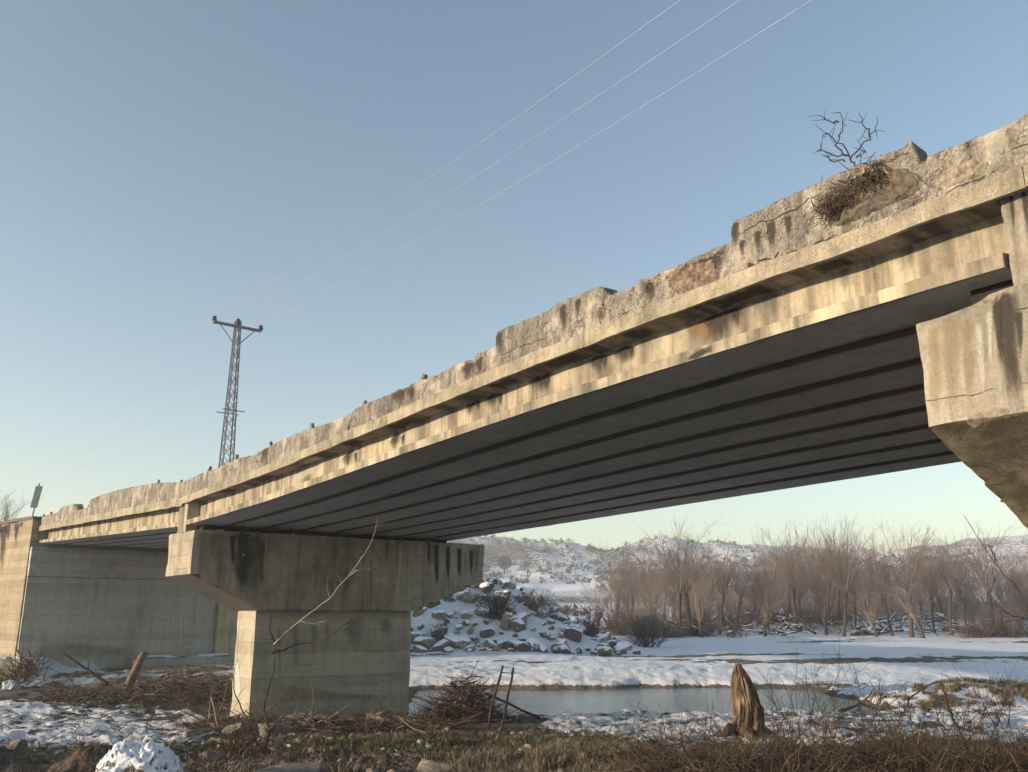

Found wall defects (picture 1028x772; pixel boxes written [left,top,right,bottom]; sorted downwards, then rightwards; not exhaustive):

spalling [595,304,606,324]
damp [977,293,1022,382]
damp [0,522,23,565]
damp [229,532,282,588]
damp [428,543,473,581]